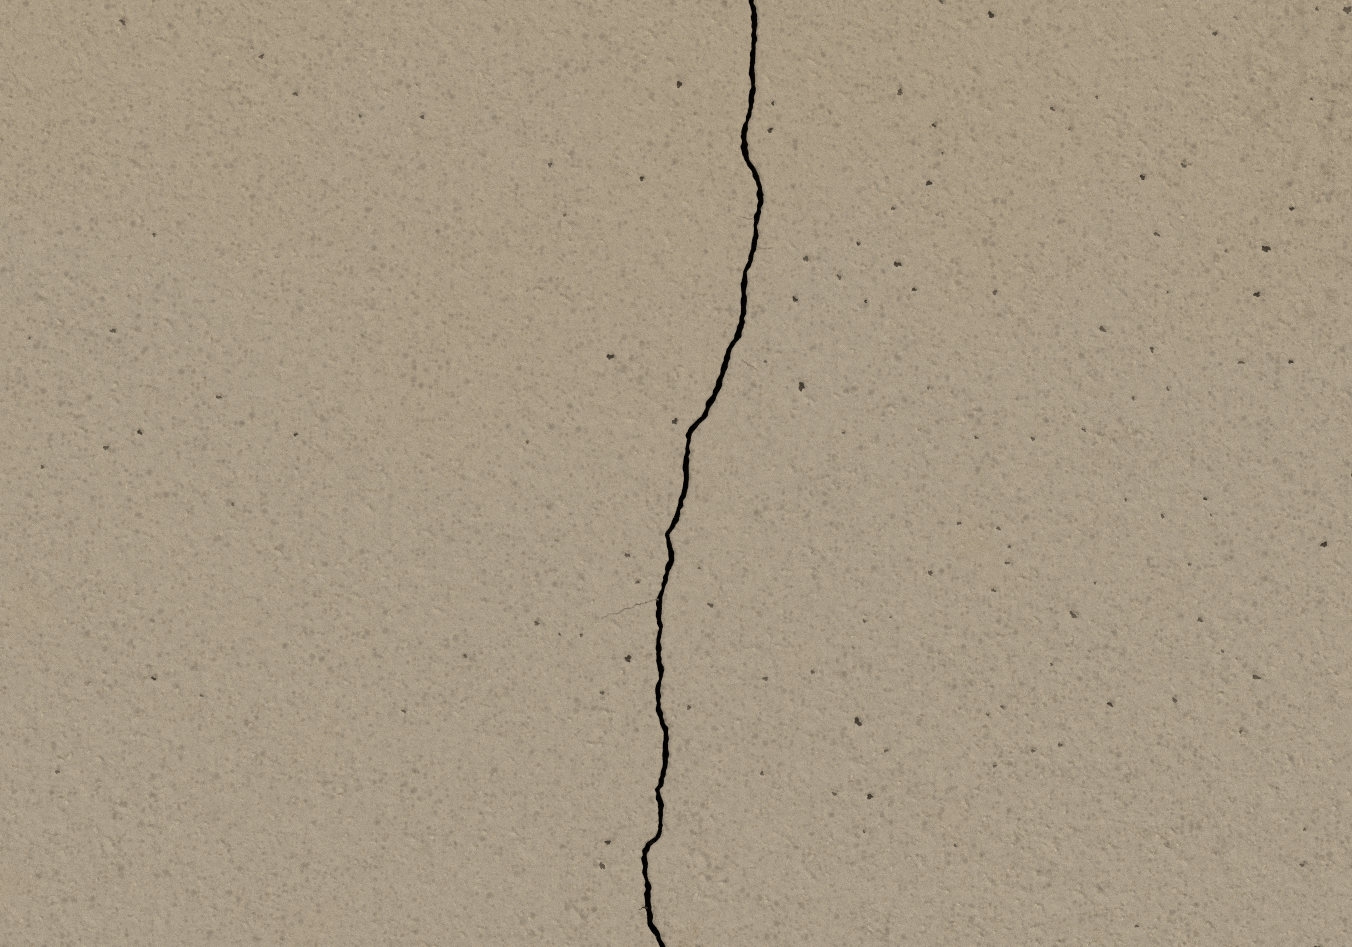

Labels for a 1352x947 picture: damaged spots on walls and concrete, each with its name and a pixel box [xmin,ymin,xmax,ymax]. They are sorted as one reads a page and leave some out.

crack [601,0,771,947]